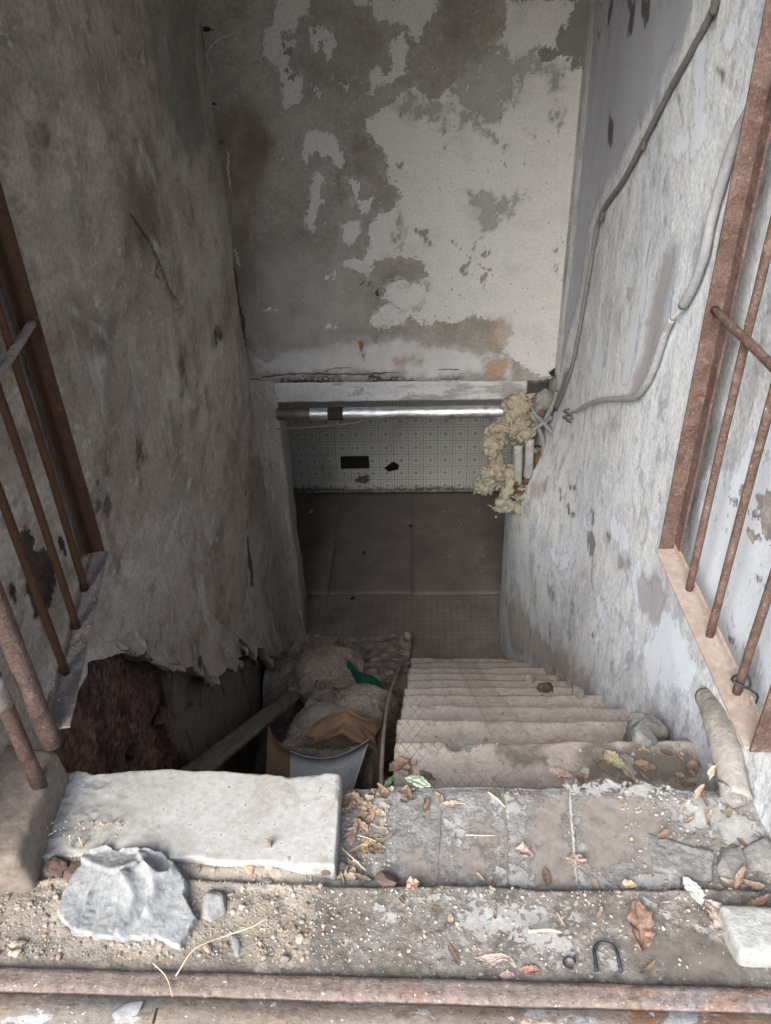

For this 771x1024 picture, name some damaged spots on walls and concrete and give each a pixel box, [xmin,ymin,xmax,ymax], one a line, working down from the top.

peeling [261,0,349,110]
peeling [298,0,708,377]
crack [129,212,180,310]
crack [233,263,397,380]